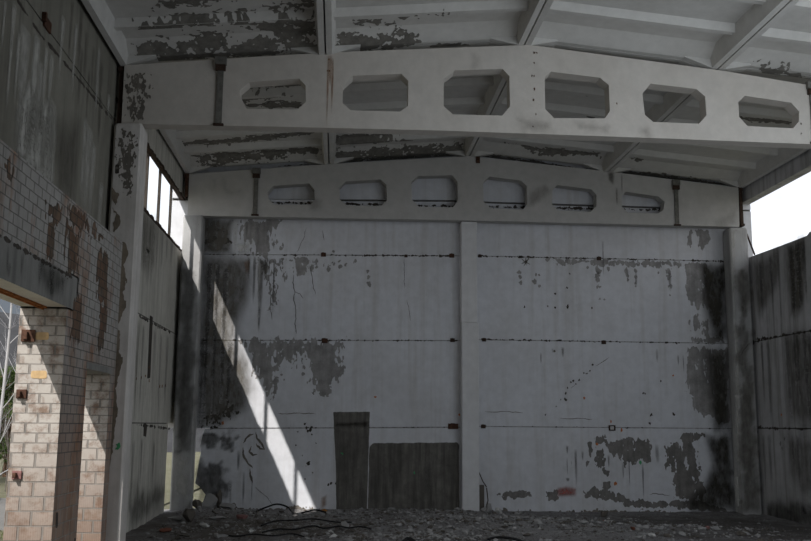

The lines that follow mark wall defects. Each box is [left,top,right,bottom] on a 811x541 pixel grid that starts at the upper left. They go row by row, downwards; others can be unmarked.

peeling [131,0,317,61]
peeling [335,9,471,51]
peeling [182,132,322,167]
peeling [335,134,464,163]
flaking render [45,188,121,352]
peeling [110,242,128,463]
peeling [232,335,379,400]
peeling [482,229,729,418]
water stain [703,265,726,340]
water stain [787,239,806,311]
water stain [691,326,761,511]
peeling [559,428,731,512]